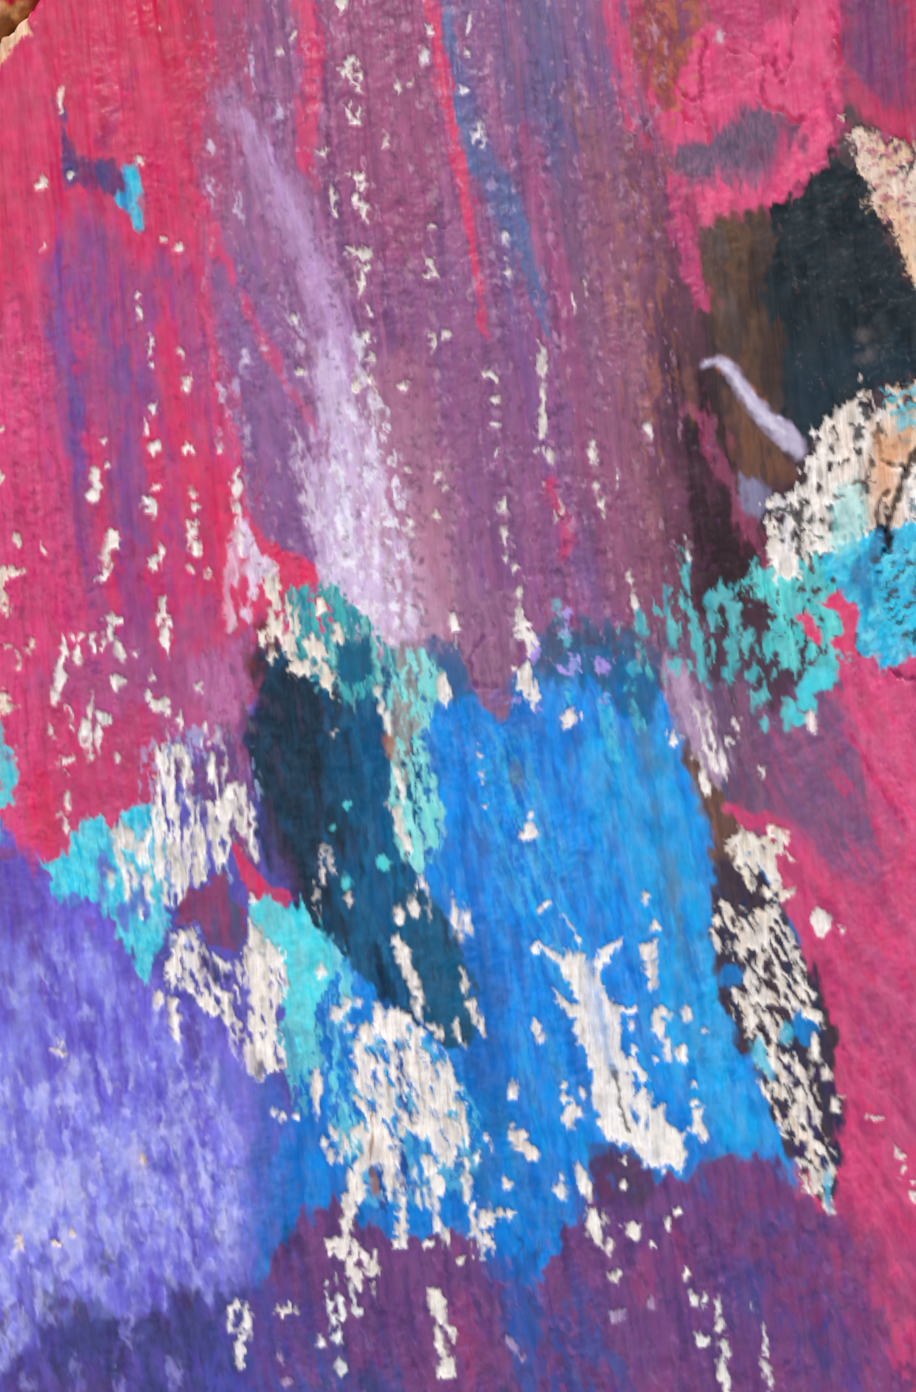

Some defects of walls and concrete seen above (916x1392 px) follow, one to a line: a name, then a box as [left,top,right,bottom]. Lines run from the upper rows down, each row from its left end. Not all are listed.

peeling [0,13,34,67]
peeling [838,115,916,288]
peeling [764,374,916,585]
crack [833,451,916,557]
peeling [259,561,345,697]
peeling [437,672,453,708]
peeling [107,675,261,921]
peeling [154,893,290,1084]
peeling [271,874,518,1380]
peeling [509,1123,539,1163]
peeling [531,893,710,1190]
peeling [710,826,840,1215]